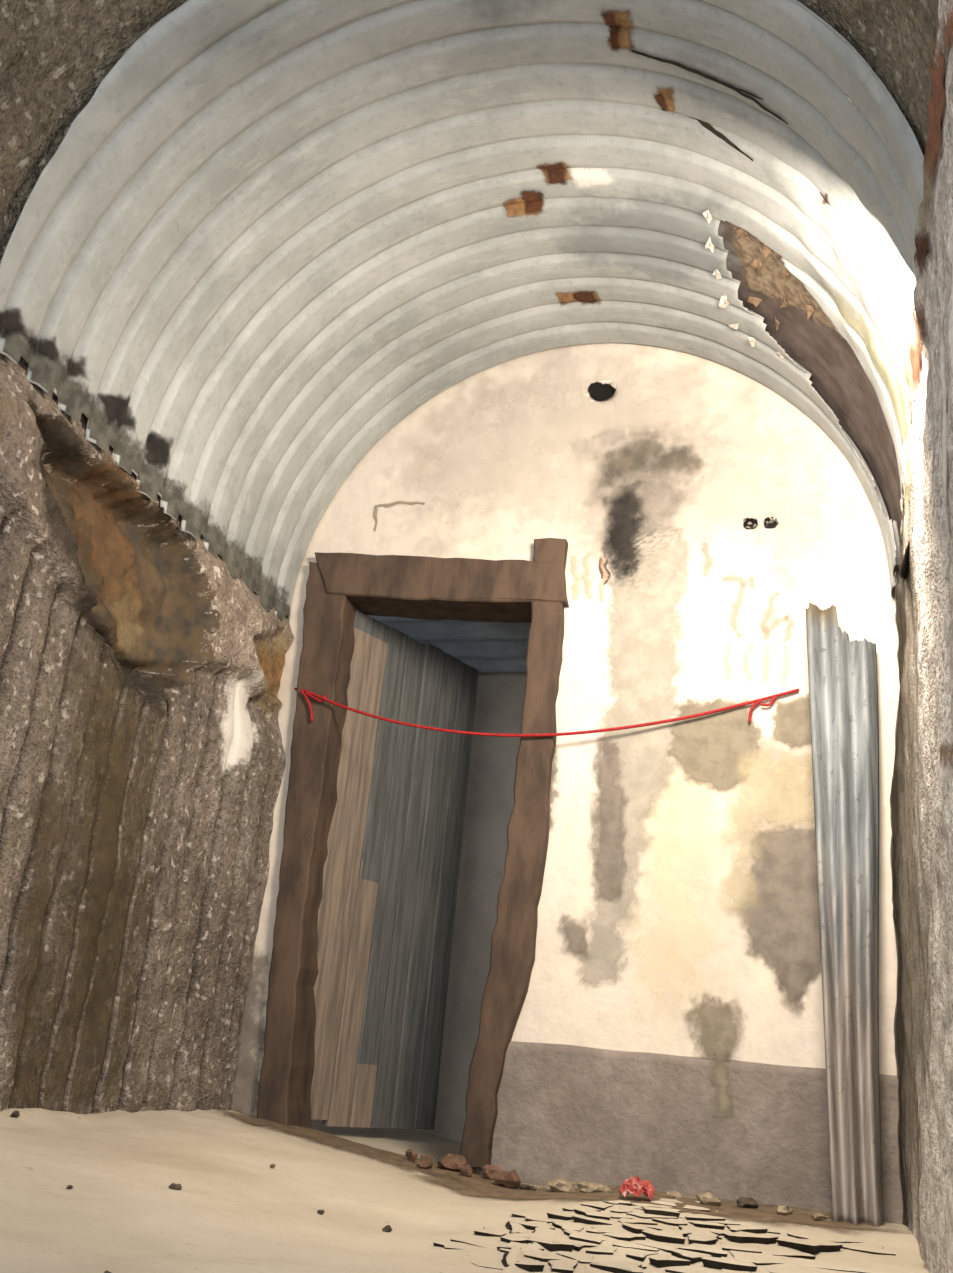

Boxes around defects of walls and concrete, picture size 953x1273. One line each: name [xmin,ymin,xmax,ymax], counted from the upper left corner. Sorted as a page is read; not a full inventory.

corrosion [601,11,634,51]
corrosion [654,88,675,113]
corrosion [503,162,612,217]
corrosion [556,291,600,305]
spalling [703,210,910,582]
water stain [607,443,700,476]
spalling [28,400,221,716]
water stain [603,489,643,576]
flaking render [559,528,811,984]
flaking render [738,827,821,1009]
crack [499,1219,558,1273]